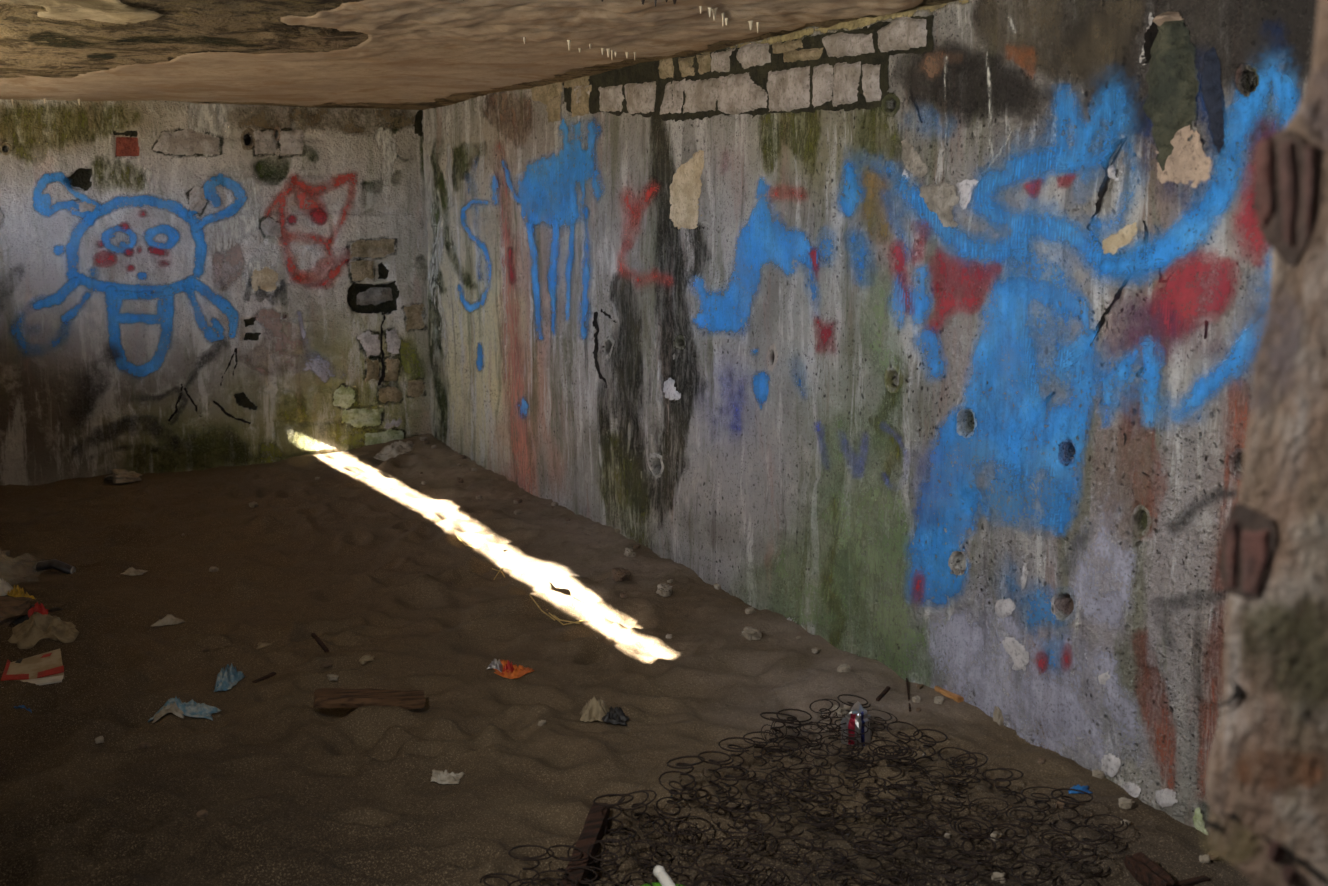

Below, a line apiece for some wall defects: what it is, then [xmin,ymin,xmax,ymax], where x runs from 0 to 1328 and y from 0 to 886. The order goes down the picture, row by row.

peeling [0,0,934,137]
spalling [1156,125,1214,190]
damp [597,115,709,527]
crack [1208,678,1242,708]